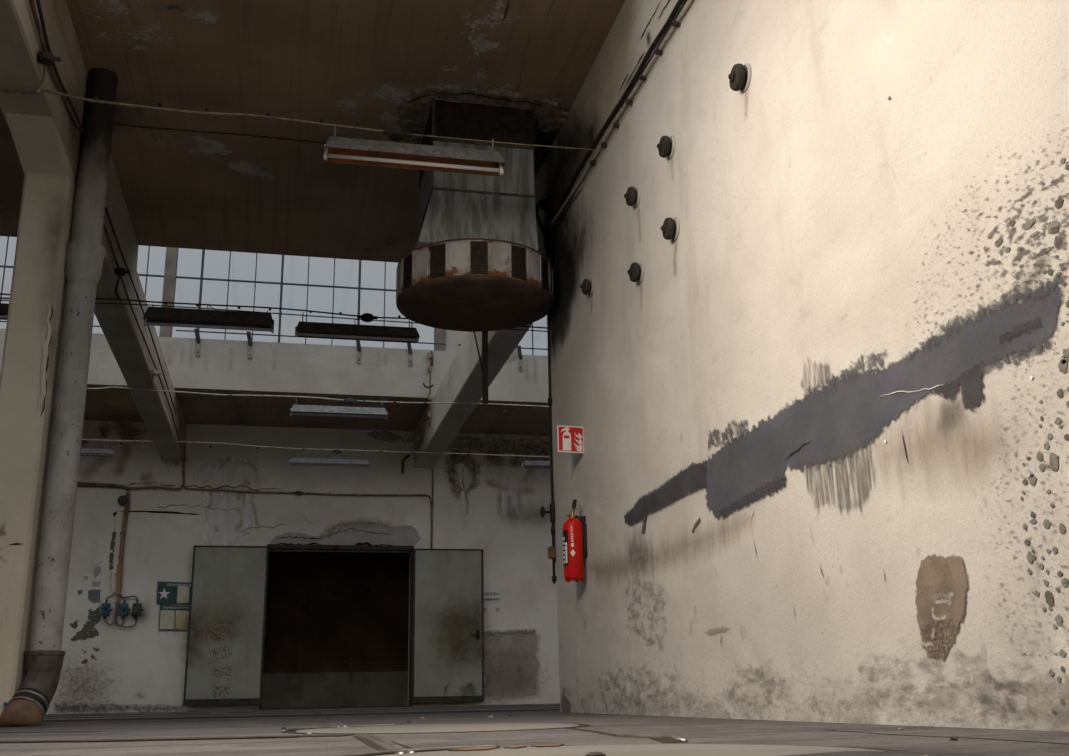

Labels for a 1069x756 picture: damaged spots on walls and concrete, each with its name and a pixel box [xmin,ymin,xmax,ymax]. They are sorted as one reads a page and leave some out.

spalling [378,81,571,144]
damp [906,127,1069,349]
damp [991,348,1069,682]
peeling [69,518,117,670]
damp [484,630,539,698]
flaking render [915,554,968,661]